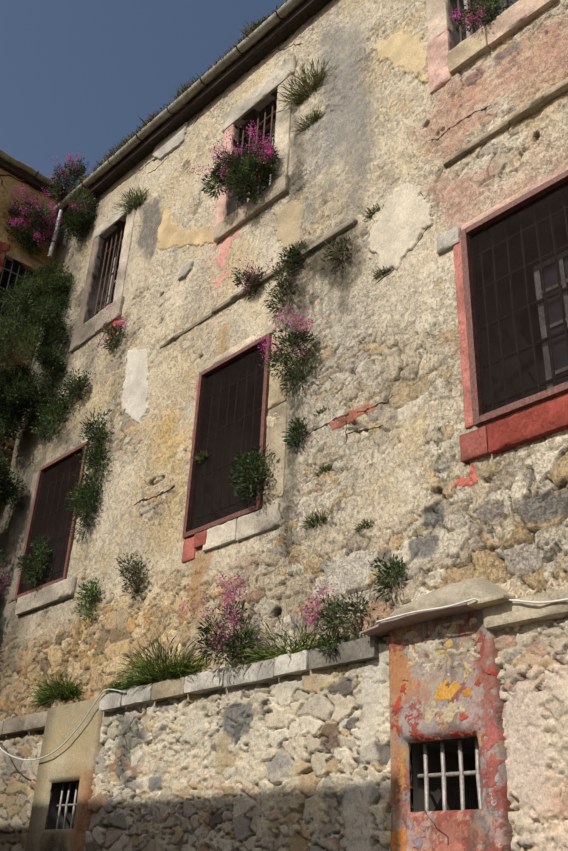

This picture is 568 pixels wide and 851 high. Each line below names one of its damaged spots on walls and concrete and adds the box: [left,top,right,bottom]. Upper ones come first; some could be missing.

flaking render [372,31,429,84]
flaking render [157,208,244,293]
flaking render [367,179,434,274]
flaking render [121,347,149,424]
flaking render [329,403,378,431]
peeling [389,639,507,817]
peeling [390,823,428,851]